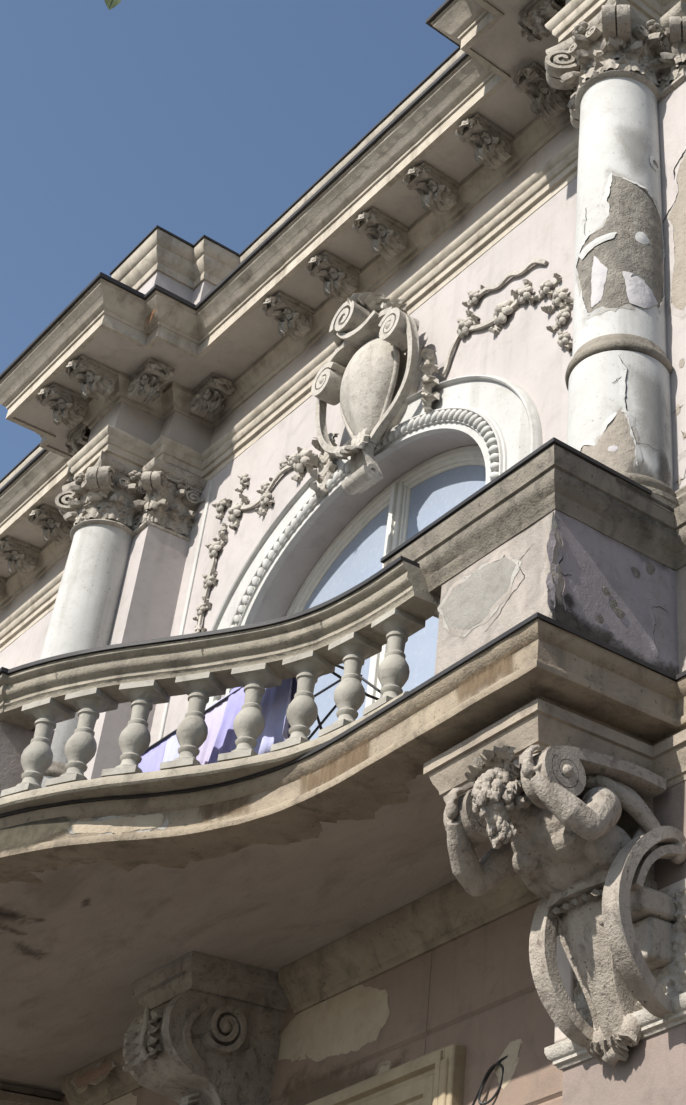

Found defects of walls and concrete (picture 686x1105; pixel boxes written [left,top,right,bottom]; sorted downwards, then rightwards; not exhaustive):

peeling [576,151,686,319]
peeling [578,406,643,473]
damp [551,594,678,675]